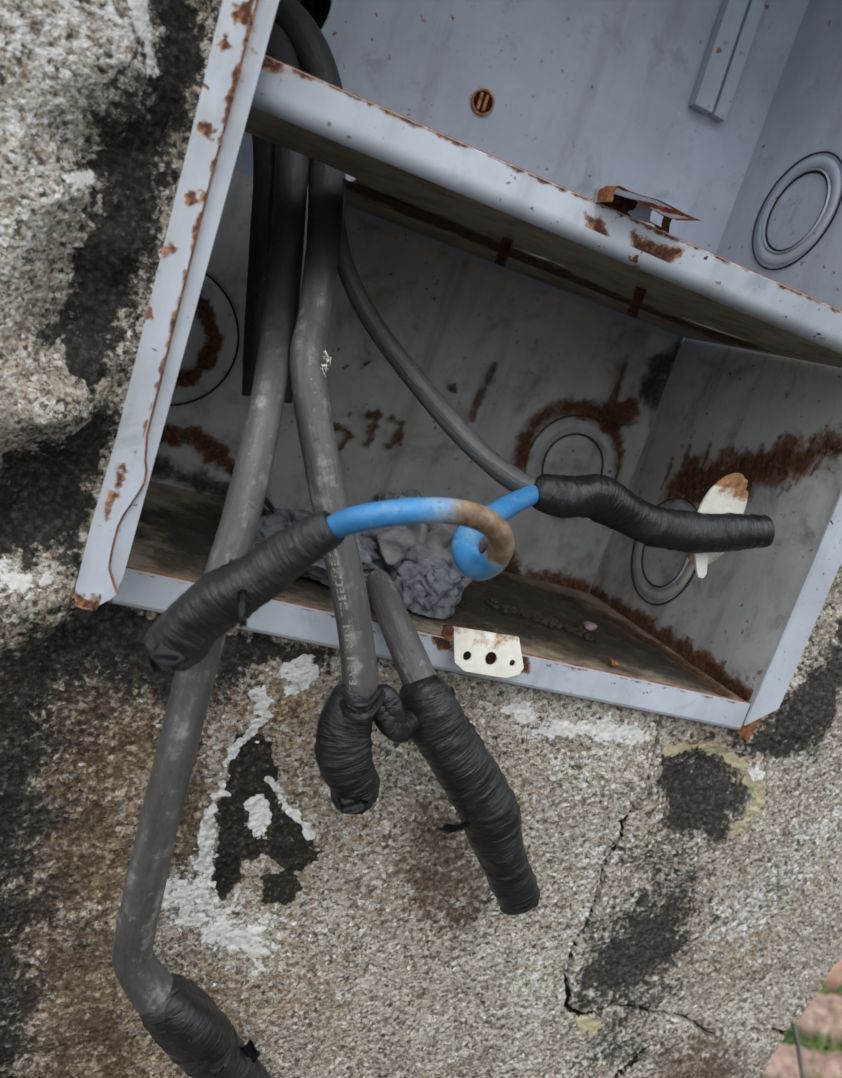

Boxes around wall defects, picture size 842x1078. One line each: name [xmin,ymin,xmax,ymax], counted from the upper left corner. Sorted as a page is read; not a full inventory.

damp [31,0,220,578]
damp [211,631,335,697]
damp [0,598,175,1078]
damp [168,742,206,885]
crack [564,804,712,1034]
damp [570,866,723,1015]
crack [614,1041,661,1078]